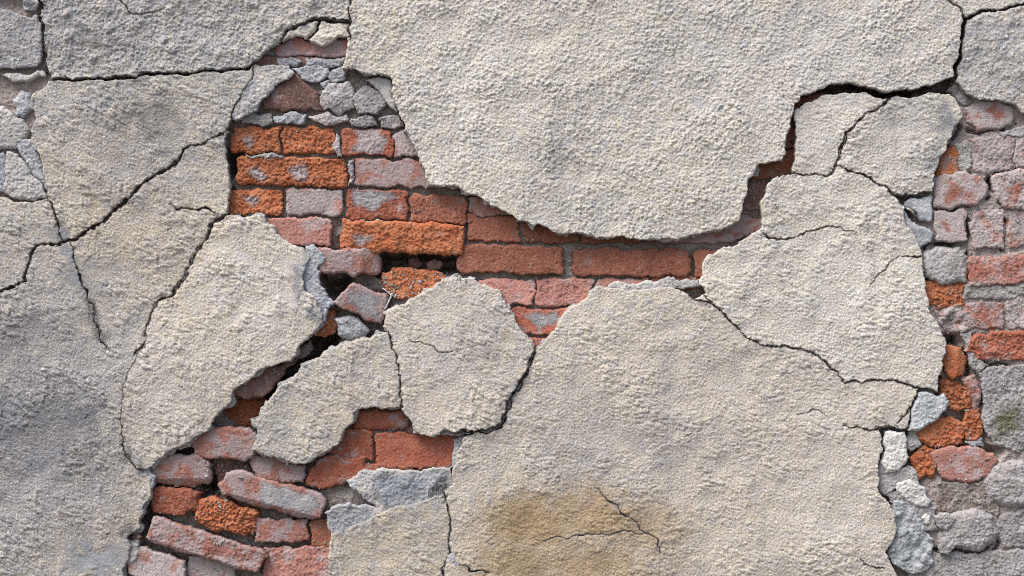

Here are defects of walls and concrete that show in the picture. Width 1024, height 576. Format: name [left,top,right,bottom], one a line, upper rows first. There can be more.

crack [36,0,249,81]
spalling [231,64,295,122]
crack [780,0,1024,224]
crack [0,132,224,349]
spalling [293,244,335,324]
spalling [604,276,700,291]
crack [763,225,857,241]
peeling [903,195,934,248]
crack [120,203,226,473]
crack [674,285,919,432]
peeling [325,435,463,535]
spalling [878,391,964,575]